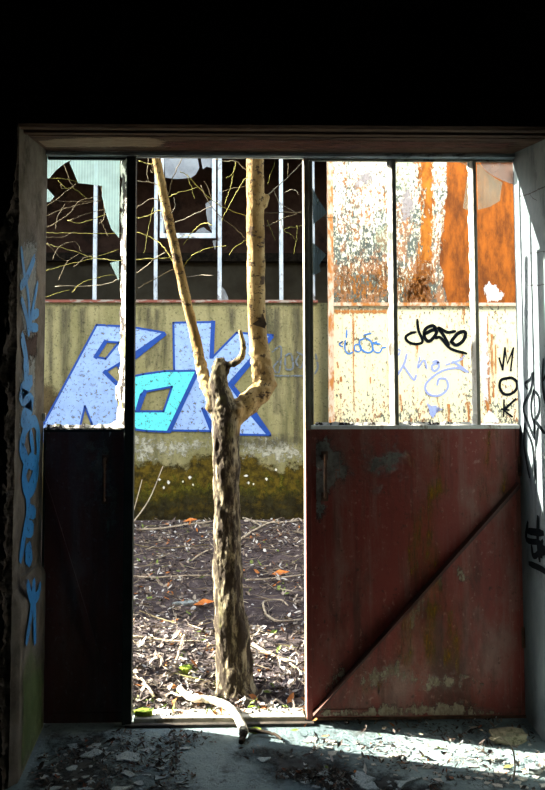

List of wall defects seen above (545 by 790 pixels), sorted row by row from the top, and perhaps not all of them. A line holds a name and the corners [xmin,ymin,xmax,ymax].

rust [334,162,516,412]
rust [321,702,502,716]